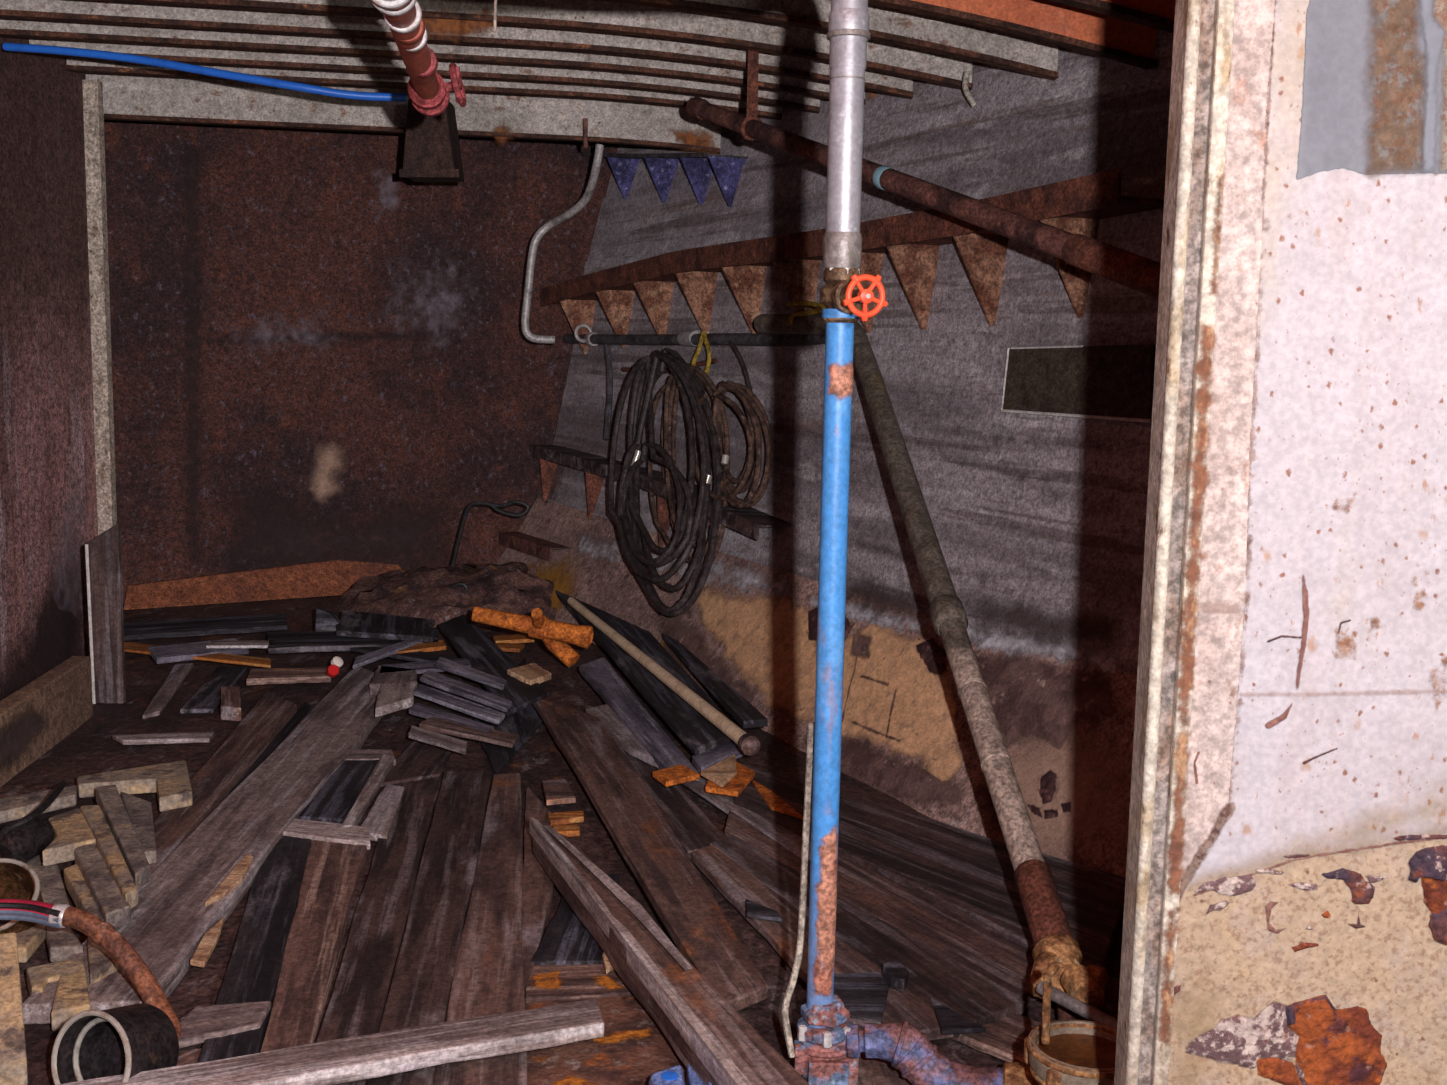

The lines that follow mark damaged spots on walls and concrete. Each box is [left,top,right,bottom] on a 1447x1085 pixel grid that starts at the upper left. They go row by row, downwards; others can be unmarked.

peeling [1297,0,1447,179]
rust [1211,176,1224,294]
water stain [316,451,337,495]
rust [1159,325,1216,1043]
spalling [1195,854,1388,933]
peeling [1292,910,1330,952]
spalling [1394,834,1447,945]
spalling [1186,995,1387,1085]